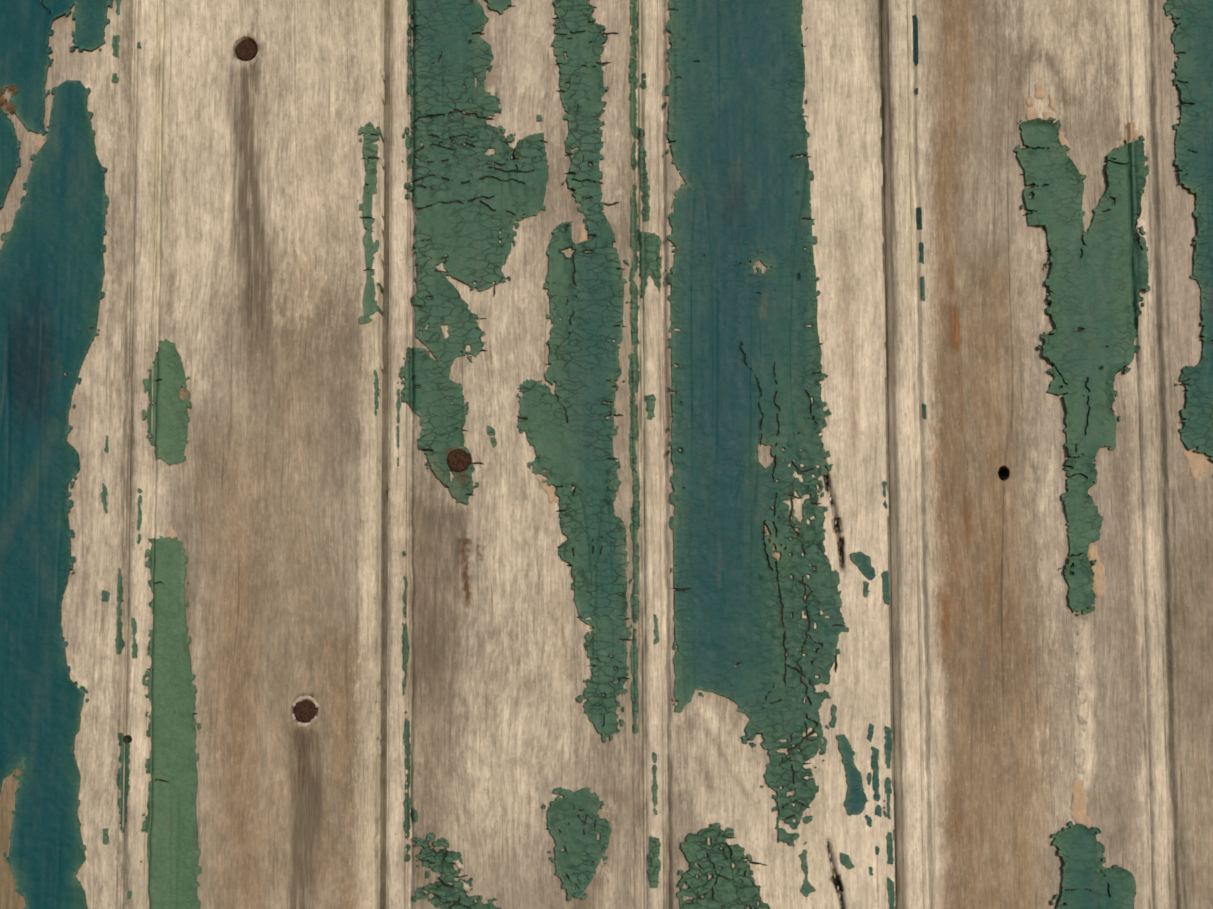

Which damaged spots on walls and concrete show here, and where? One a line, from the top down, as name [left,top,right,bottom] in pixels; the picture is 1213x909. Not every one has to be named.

peeling [0,0,121,909]
peeling [101,488,202,909]
peeling [142,338,192,465]
peeling [357,122,384,324]
peeling [396,0,895,909]
crack [823,475,845,568]
crack [827,841,844,909]
peeling [1014,83,1150,657]
peeling [1163,0,1213,479]